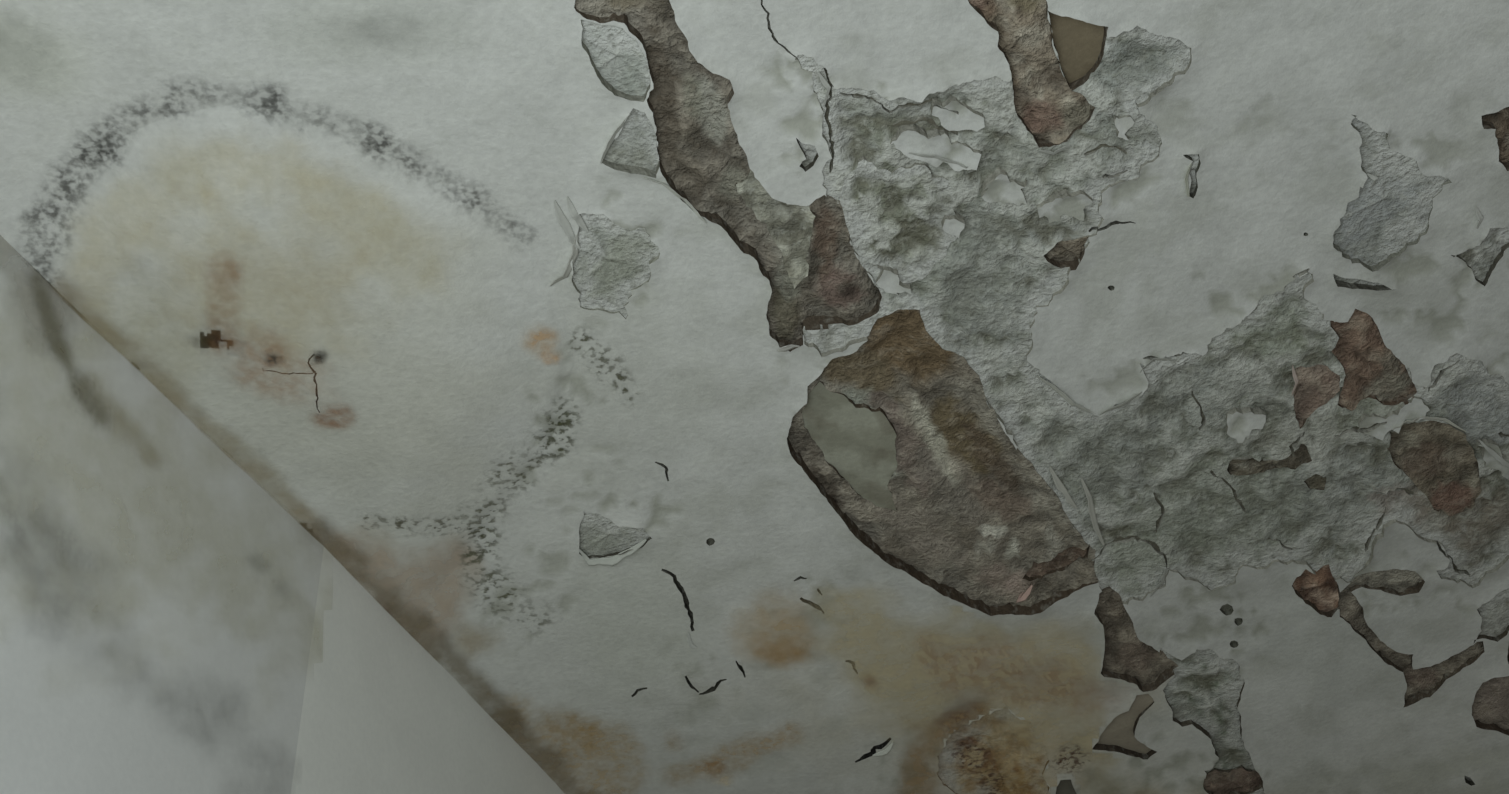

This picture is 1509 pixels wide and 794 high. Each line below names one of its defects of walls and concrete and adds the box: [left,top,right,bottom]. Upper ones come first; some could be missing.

crack [761,0,796,58]
leakage [33,172,80,218]
peeling [550,197,660,319]
peeling [574,0,1509,794]
leakage [496,407,572,488]
crack [661,569,746,695]
crack [855,738,893,763]